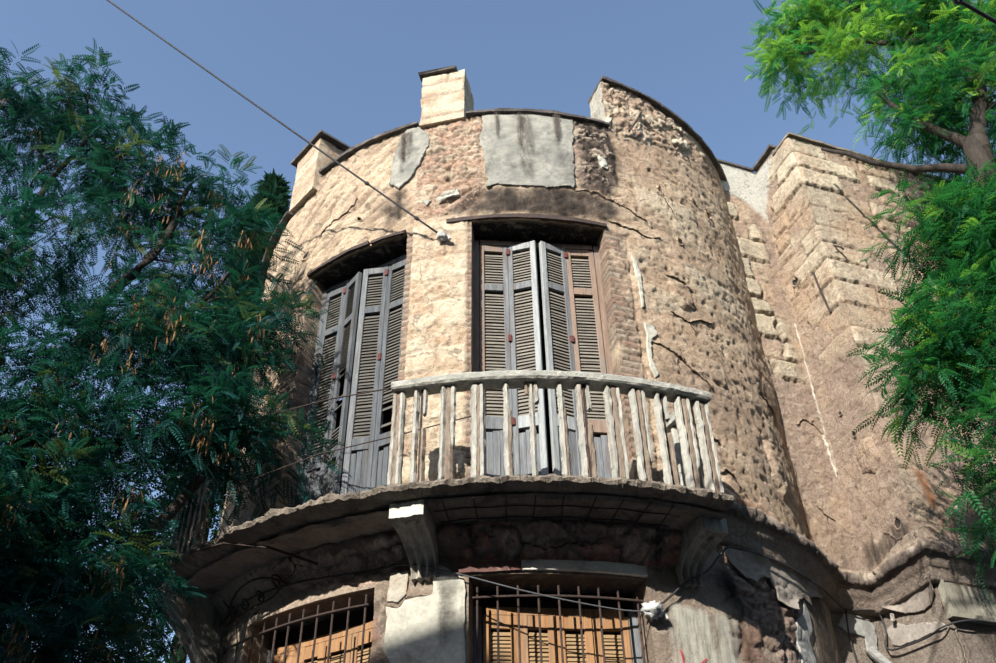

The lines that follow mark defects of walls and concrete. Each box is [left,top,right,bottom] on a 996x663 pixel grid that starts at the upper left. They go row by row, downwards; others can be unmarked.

crack [576,184,678,239]
crack [666,273,693,292]
crack [671,310,713,333]
crack [652,340,713,388]
spalling [248,495,682,663]
flaking render [719,546,822,663]
flaking render [837,576,947,663]